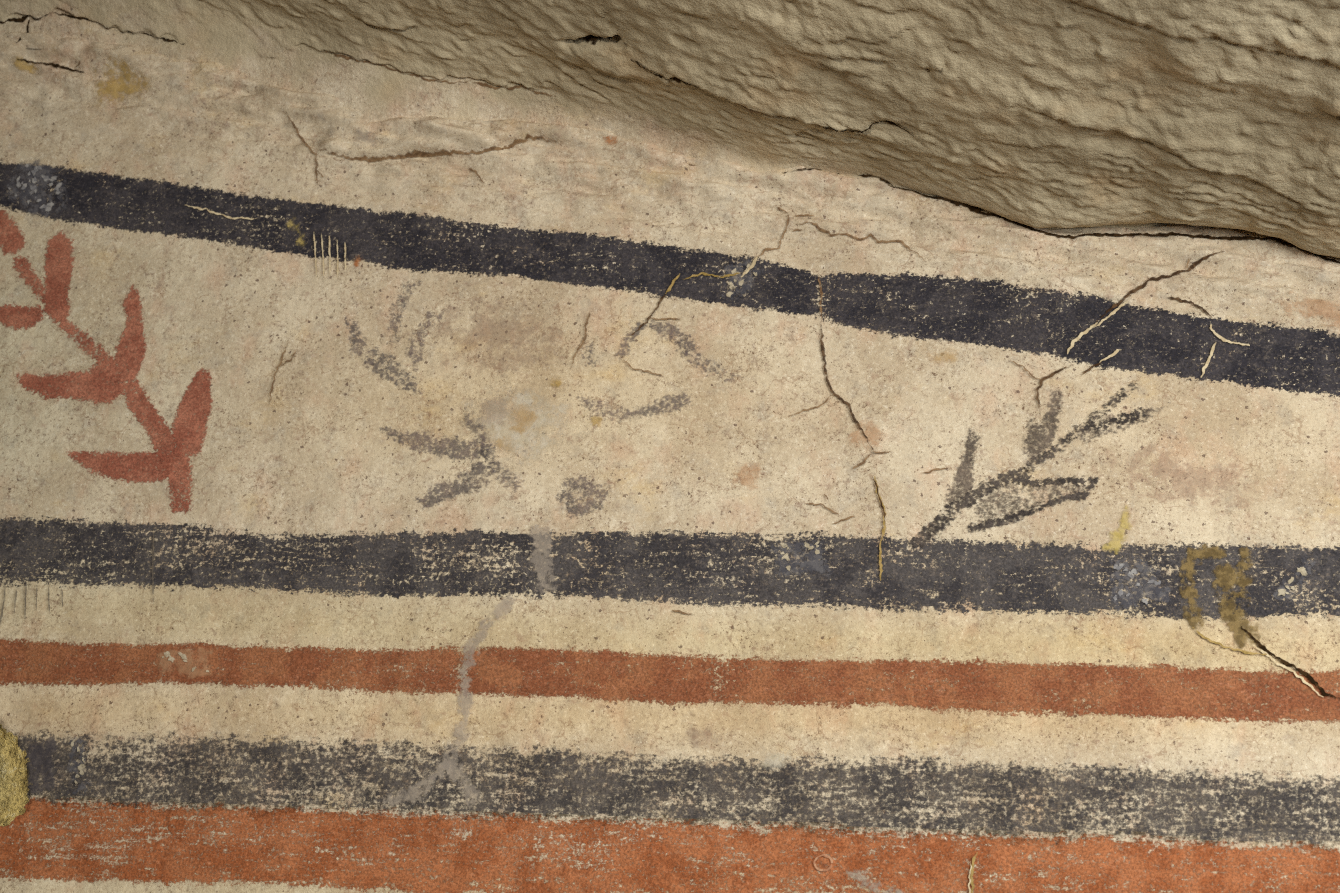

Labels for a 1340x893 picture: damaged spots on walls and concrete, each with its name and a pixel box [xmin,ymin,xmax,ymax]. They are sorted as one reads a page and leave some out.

crack [0,12,185,73]
crack [624,207,924,376]
crack [783,167,1340,415]
crack [790,277,891,581]
crack [1192,626,1337,698]